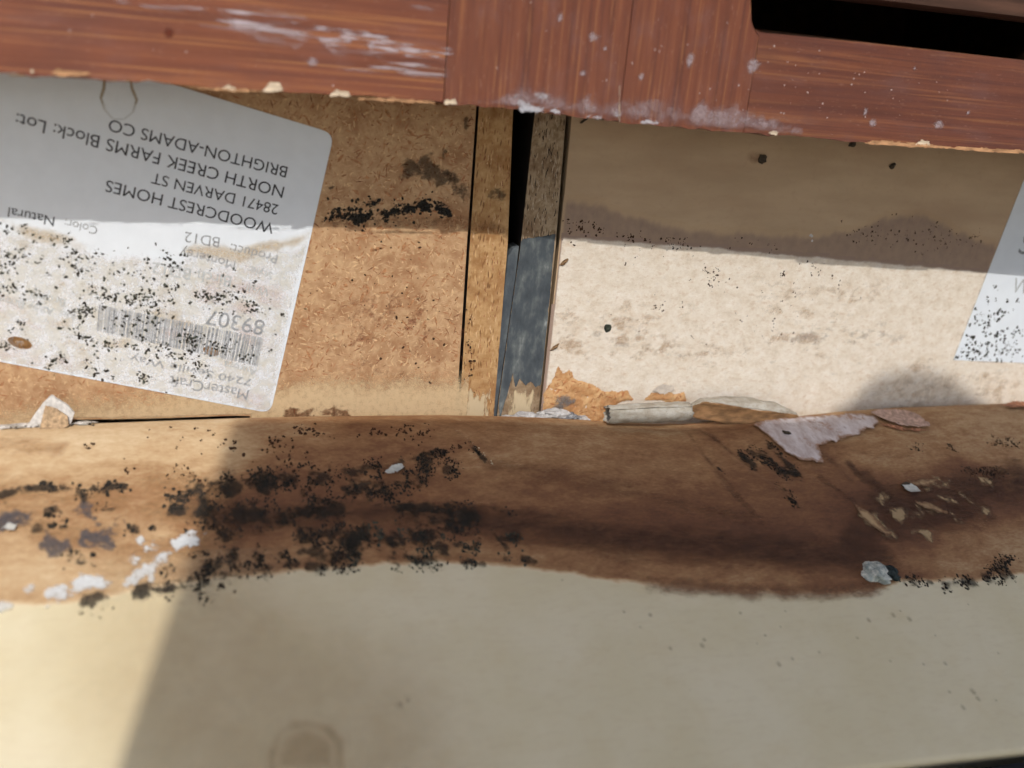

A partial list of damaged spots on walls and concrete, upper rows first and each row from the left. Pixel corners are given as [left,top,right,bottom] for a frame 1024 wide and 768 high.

leakage [322,157,463,232]
leakage [0,193,1024,618]
peeling [543,366,930,463]